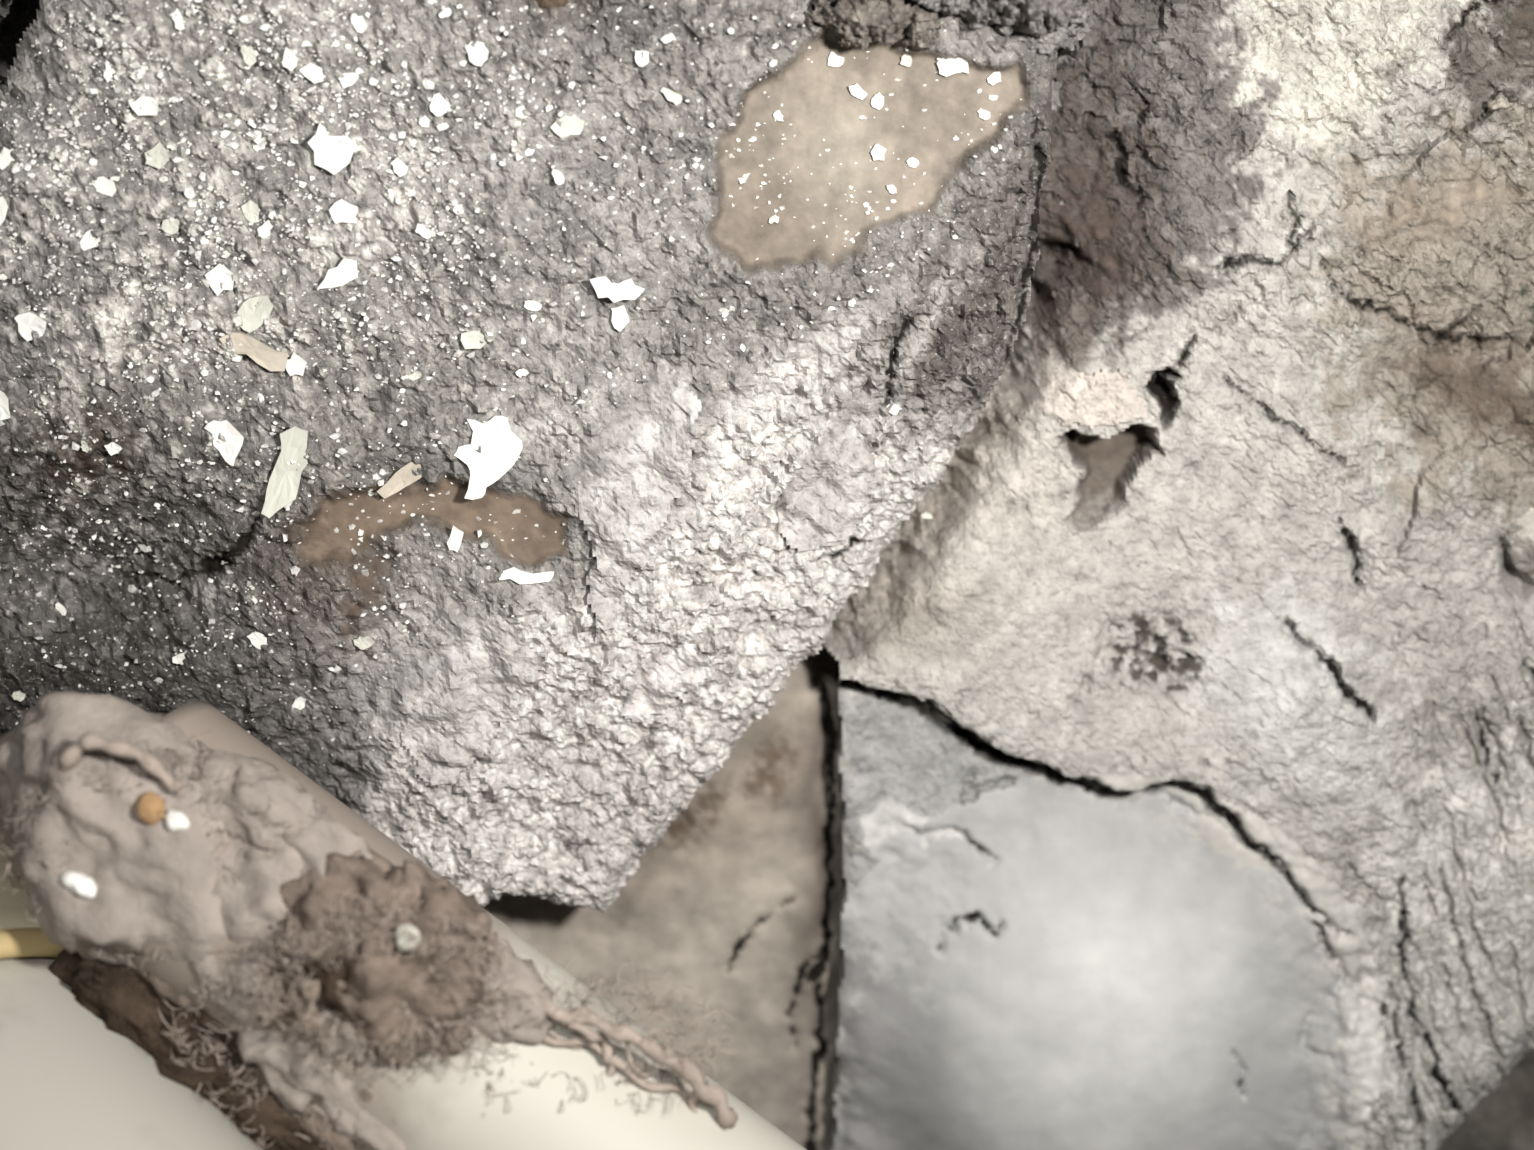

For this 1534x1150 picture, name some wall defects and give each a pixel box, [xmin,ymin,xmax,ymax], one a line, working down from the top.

crack [1453,0,1498,29]
spalling [708,26,1031,270]
crack [1223,192,1309,269]
crack [1331,283,1507,343]
peeling [1020,357,1179,511]
peeling [299,367,702,640]
crack [1340,521,1361,587]
crack [1286,621,1373,720]
crack [1475,716,1506,795]
crack [729,679,1348,1150]
crack [1380,877,1464,1149]